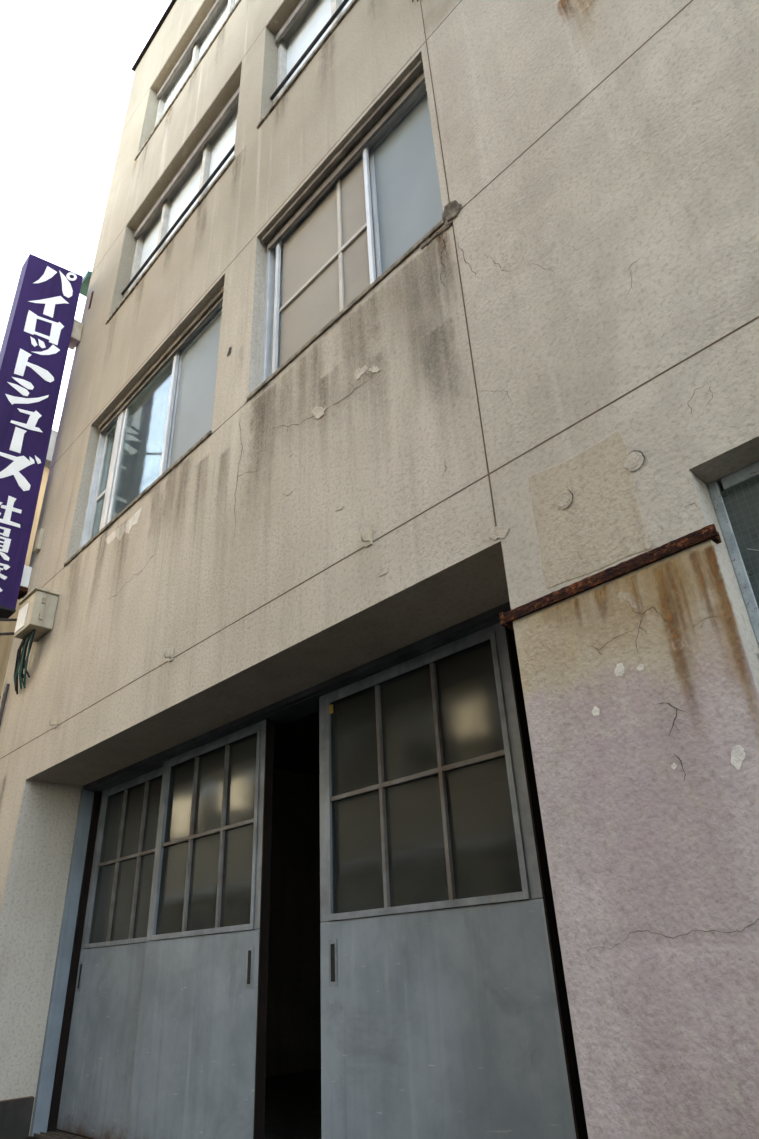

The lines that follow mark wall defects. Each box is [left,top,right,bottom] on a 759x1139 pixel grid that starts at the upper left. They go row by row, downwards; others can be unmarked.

corrosion [499,524,747,683]